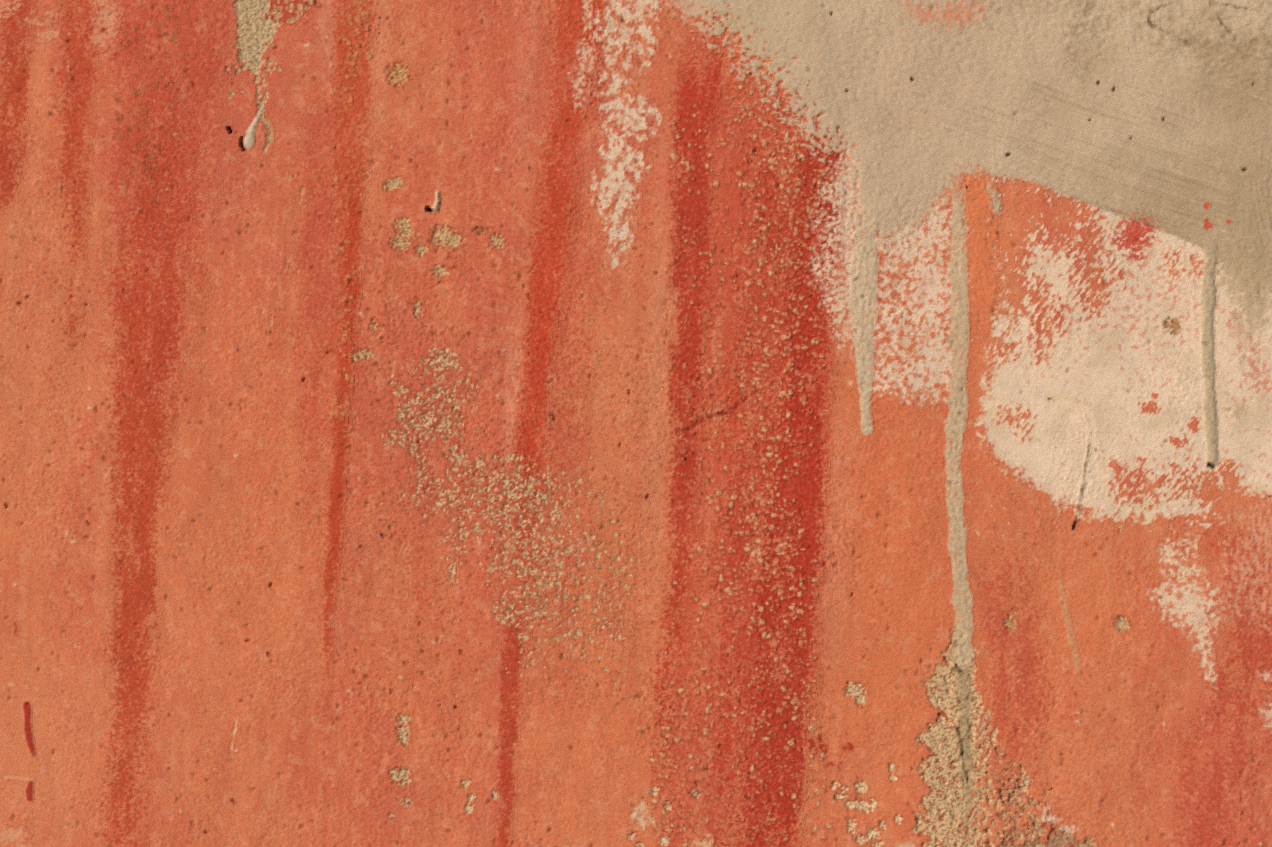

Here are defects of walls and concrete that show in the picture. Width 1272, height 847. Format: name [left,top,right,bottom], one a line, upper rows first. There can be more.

water stain [52,0,237,847]
spalling [225,0,316,155]
water stain [493,626,528,847]
water stain [481,0,608,535]
peeling [329,0,1104,847]
water stain [643,18,843,847]